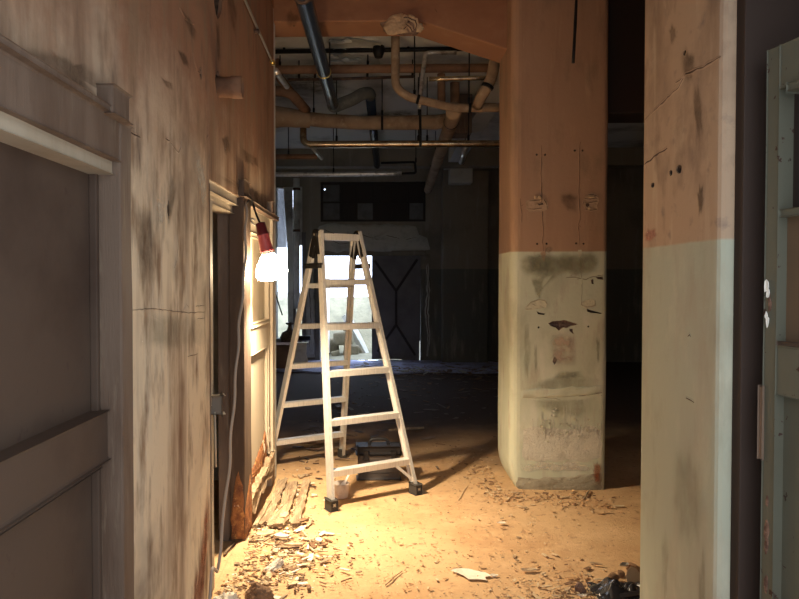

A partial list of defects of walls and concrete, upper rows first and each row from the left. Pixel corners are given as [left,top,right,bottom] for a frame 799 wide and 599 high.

crack [645,56,721,121]
spalling [537,312,576,333]
corrosion [230,431,267,539]